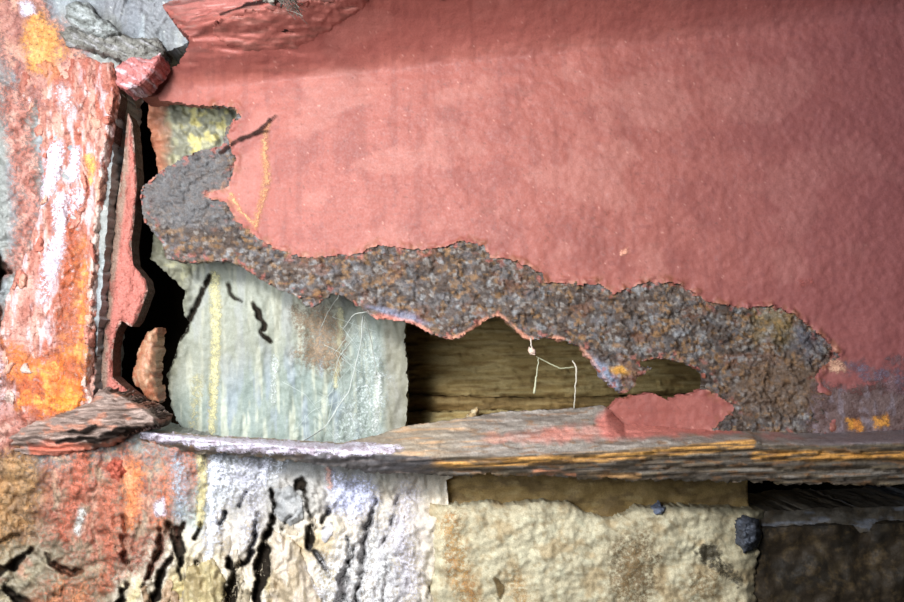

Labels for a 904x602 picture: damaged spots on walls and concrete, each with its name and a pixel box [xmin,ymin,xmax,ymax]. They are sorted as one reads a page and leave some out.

crack [0,255,12,327]
rust [0,0,87,276]
rust [84,153,96,185]
rust [0,192,210,602]
rust [140,106,904,434]
crack [116,488,399,602]